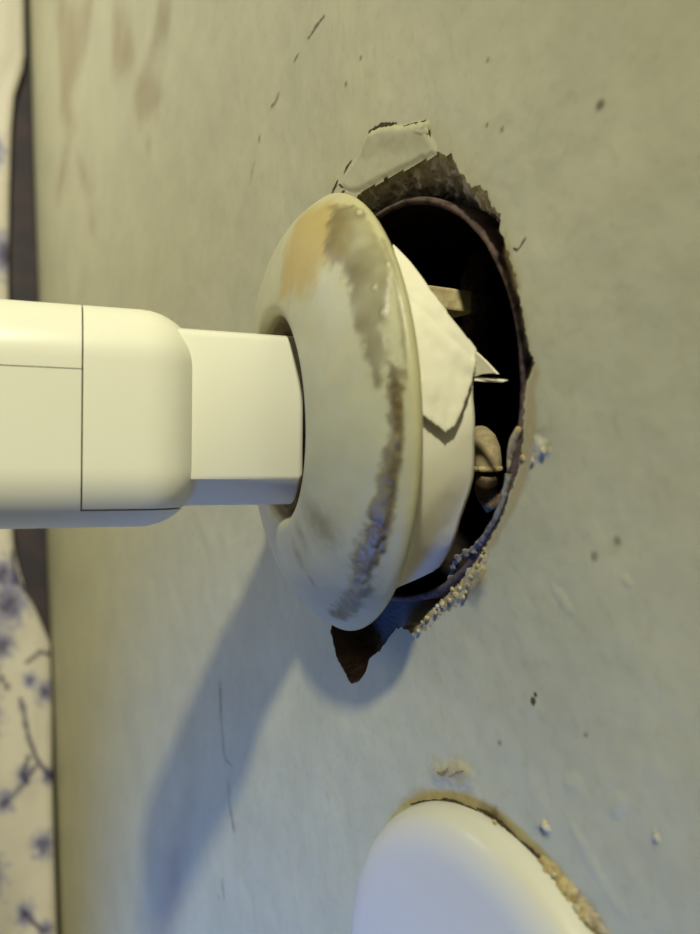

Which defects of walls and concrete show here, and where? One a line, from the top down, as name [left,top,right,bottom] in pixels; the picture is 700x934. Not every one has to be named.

peeling [342,119,501,223]
flaking render [509,399,551,510]
flaking render [330,533,497,684]
spalling [534,850,611,934]